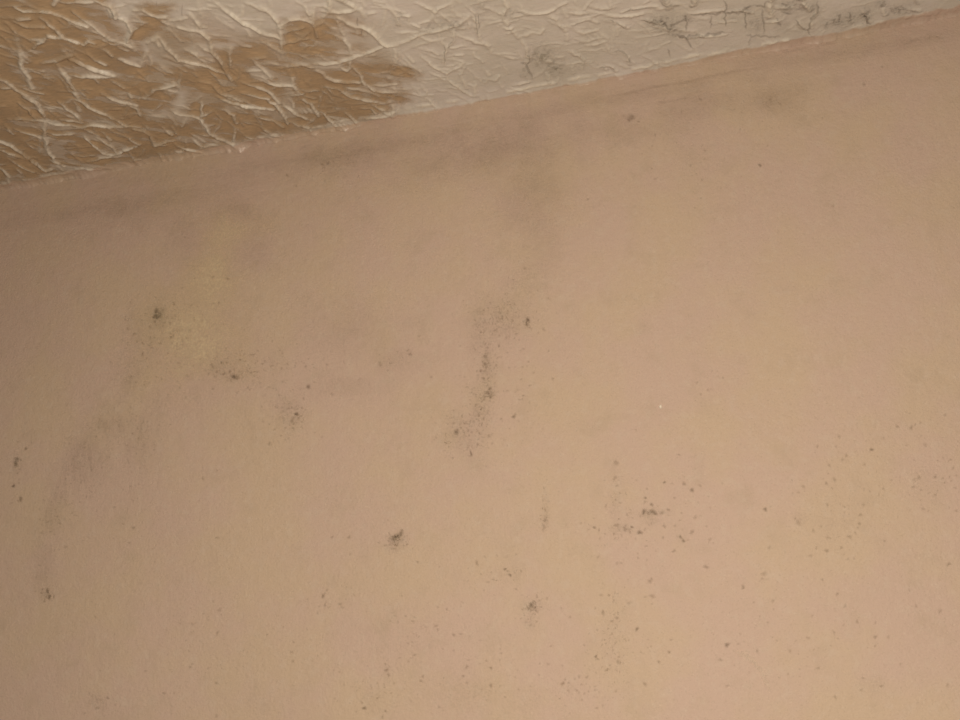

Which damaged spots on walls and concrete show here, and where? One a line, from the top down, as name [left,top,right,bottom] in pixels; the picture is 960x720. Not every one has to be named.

leakage [0,0,414,181]